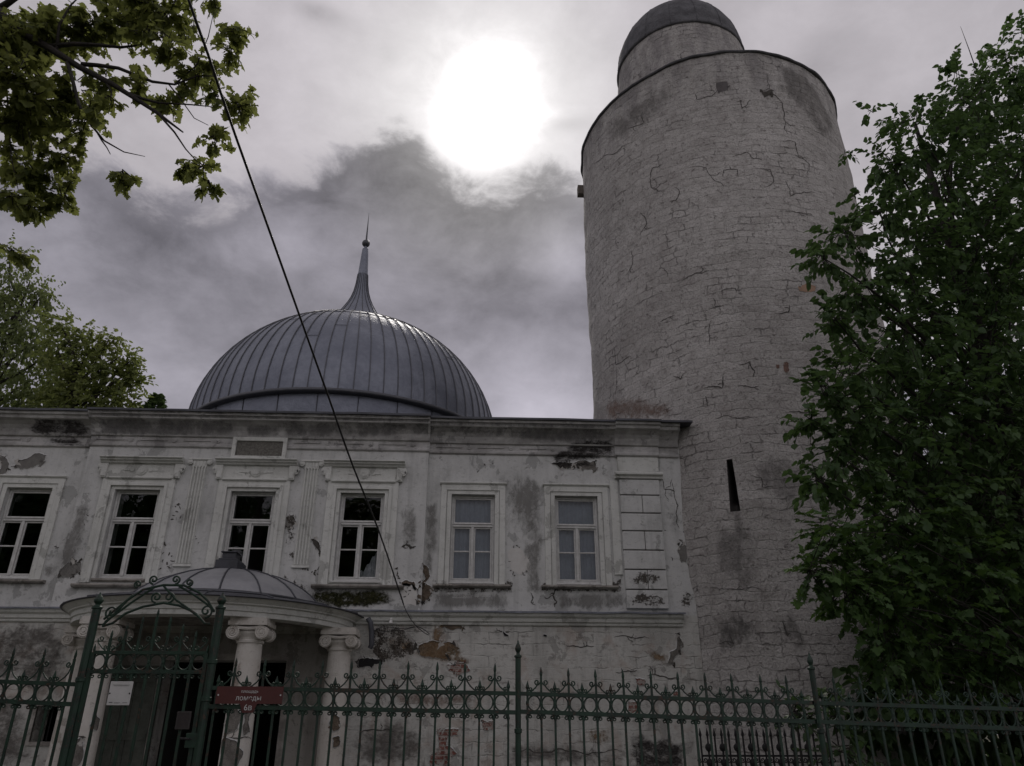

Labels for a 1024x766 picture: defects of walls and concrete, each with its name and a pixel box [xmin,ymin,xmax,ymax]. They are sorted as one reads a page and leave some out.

crack [650,77,815,216]
crack [661,267,740,343]
crack [674,361,759,419]
damp [31,419,87,446]
peeling [0,453,47,474]
spalling [551,459,599,473]
peeling [672,531,688,565]
peeling [58,558,82,579]
damp [335,593,375,607]
spalling [632,570,665,606]
spalling [412,625,471,677]
spalling [667,632,684,668]